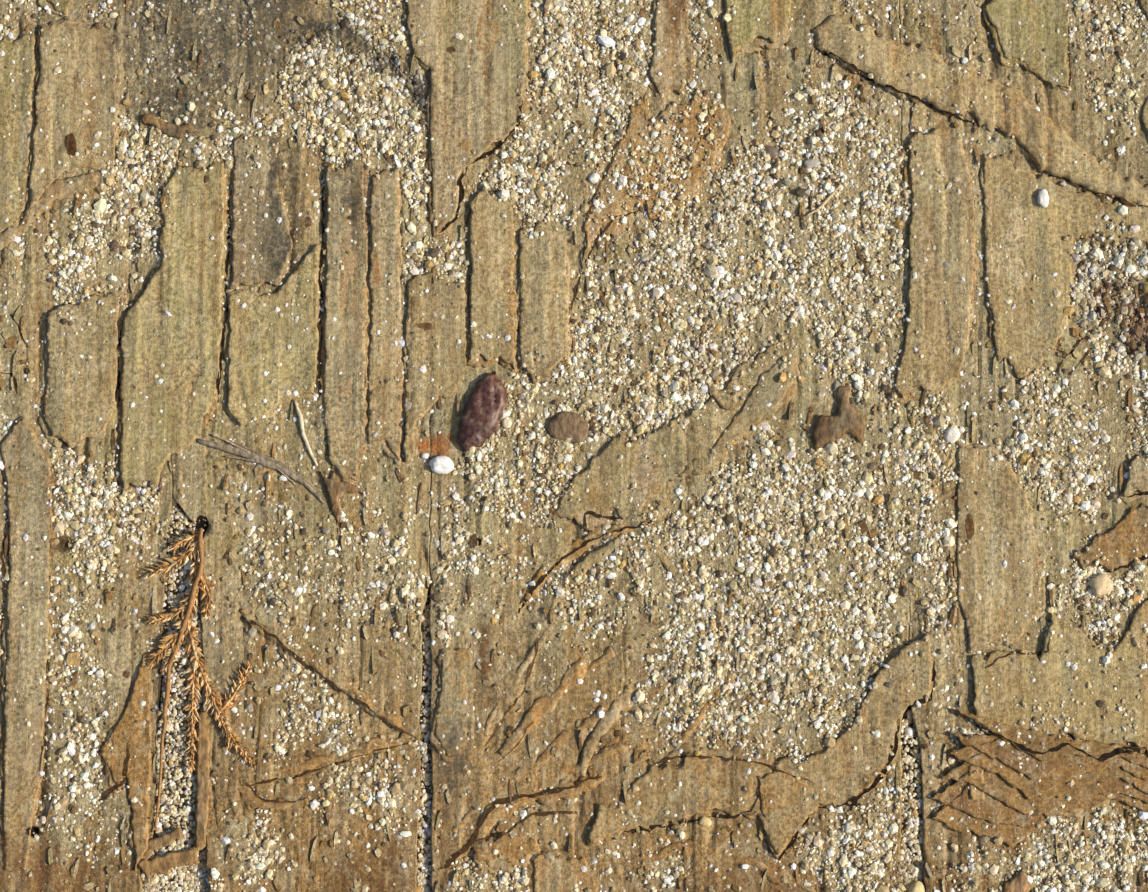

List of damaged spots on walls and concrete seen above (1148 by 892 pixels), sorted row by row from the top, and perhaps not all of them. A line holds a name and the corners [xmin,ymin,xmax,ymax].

damp [112,0,290,124]
damp [301,18,431,108]
crack [814,50,974,129]
crack [1065,0,1073,86]
crack [439,100,523,233]
crack [1016,140,1148,207]
crack [1,372,18,394]
crack [1049,336,1092,388]
crack [1106,555,1148,572]
crack [624,661,936,860]